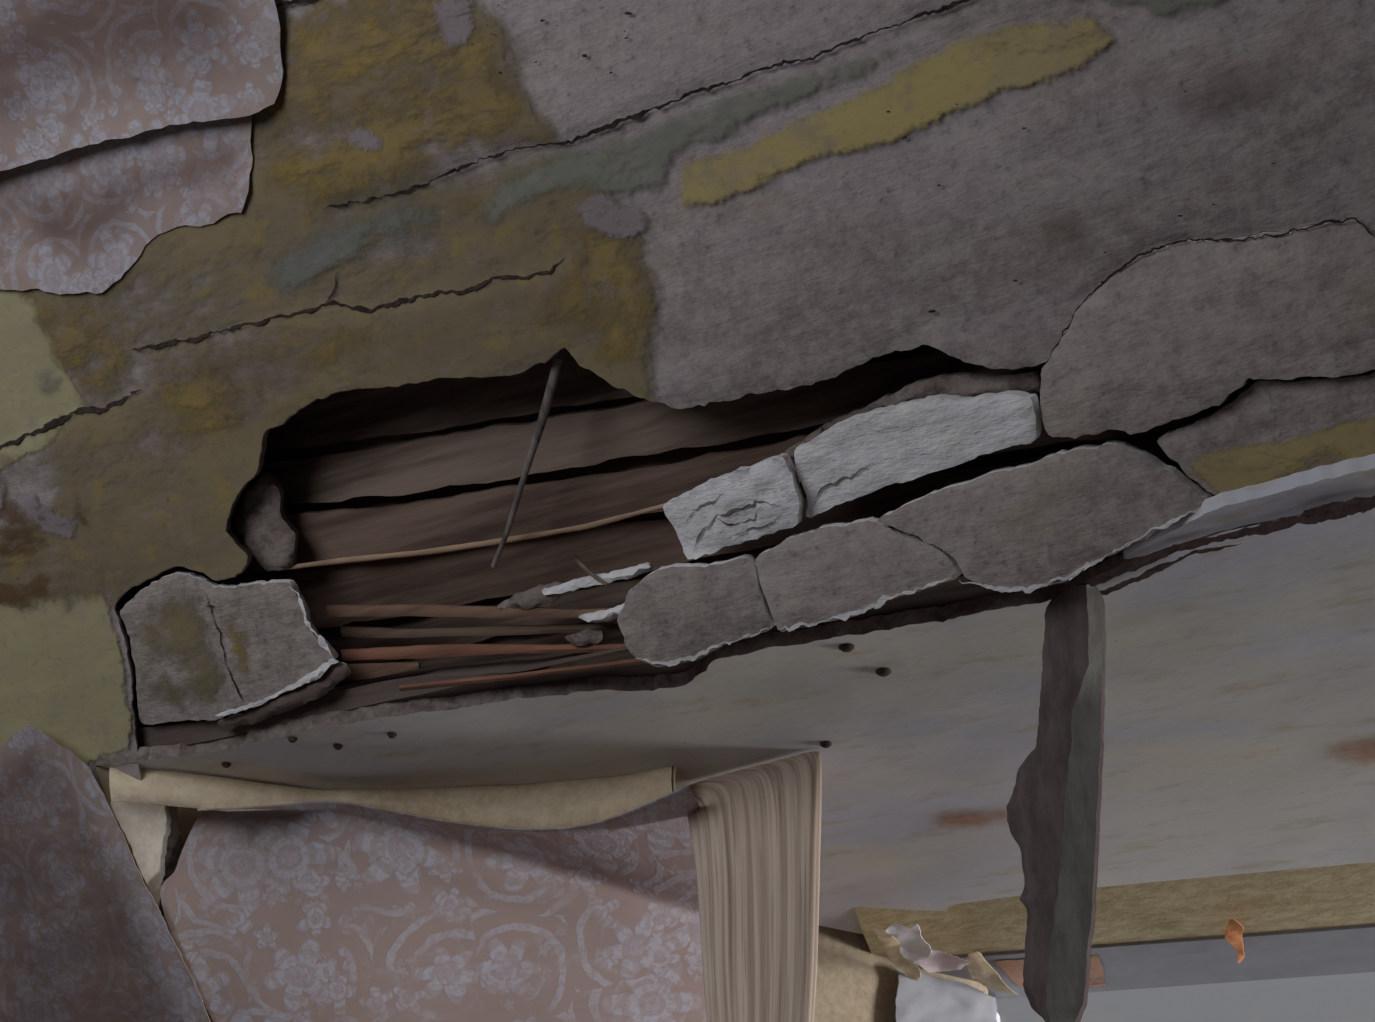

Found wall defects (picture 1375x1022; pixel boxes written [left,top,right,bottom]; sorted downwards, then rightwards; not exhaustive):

crack [276,0,317,8]
crack [326,0,970,208]
peeling [681,18,1113,206]
crack [132,258,564,351]
crack [1049,217,1375,359]
crack [0,389,142,448]
peeling [0,0,657,765]